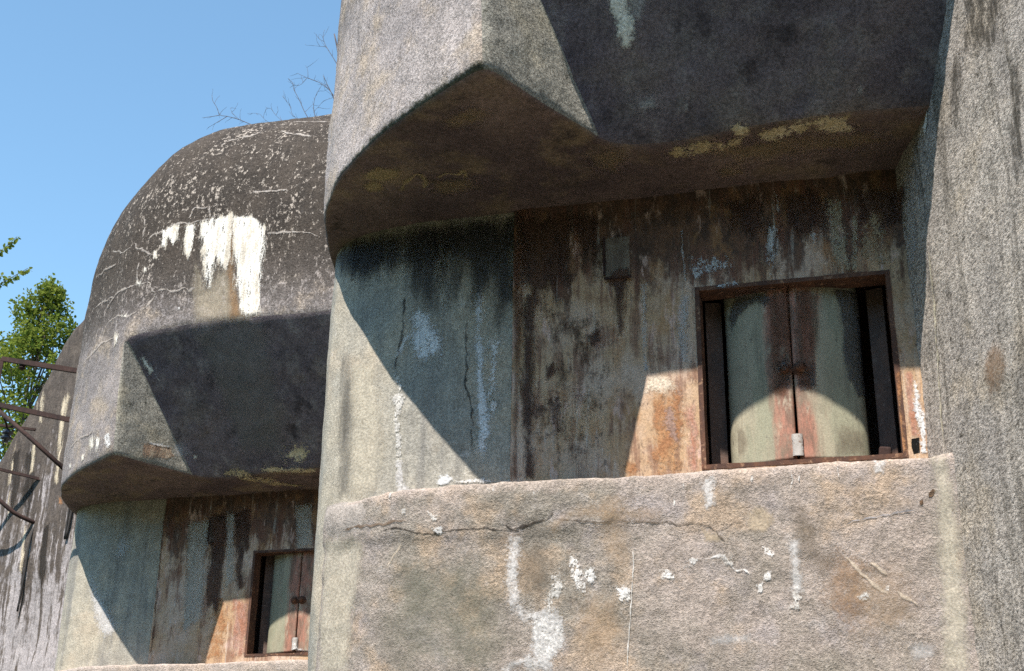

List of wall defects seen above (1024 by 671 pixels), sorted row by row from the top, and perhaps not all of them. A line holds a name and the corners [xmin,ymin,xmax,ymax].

crack [84,206,212,362]
water stain [144,211,266,318]
crack [395,299,405,366]
water stain [336,219,514,452]
crack [464,330,473,443]
rust [652,394,699,474]
rust [770,288,816,394]
water stain [834,290,866,397]
rust [897,371,920,450]
crack [347,513,740,540]
rust [206,509,250,658]
water stain [505,537,596,671]